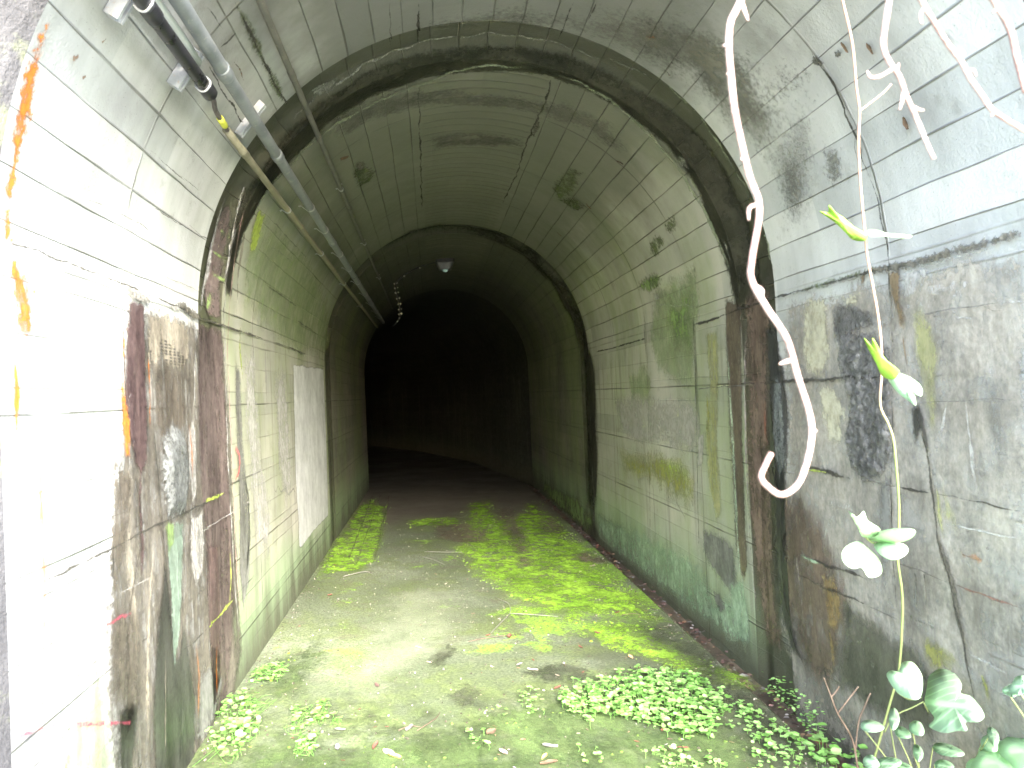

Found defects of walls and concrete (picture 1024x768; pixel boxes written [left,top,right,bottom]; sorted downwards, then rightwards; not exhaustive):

rust [5,25,47,241]
crack [416,88,424,205]
crack [503,80,551,202]
crack [812,54,888,247]
rust [11,260,35,333]
water stain [105,46,779,768]
crack [693,271,1018,697]
water stain [782,258,1024,768]